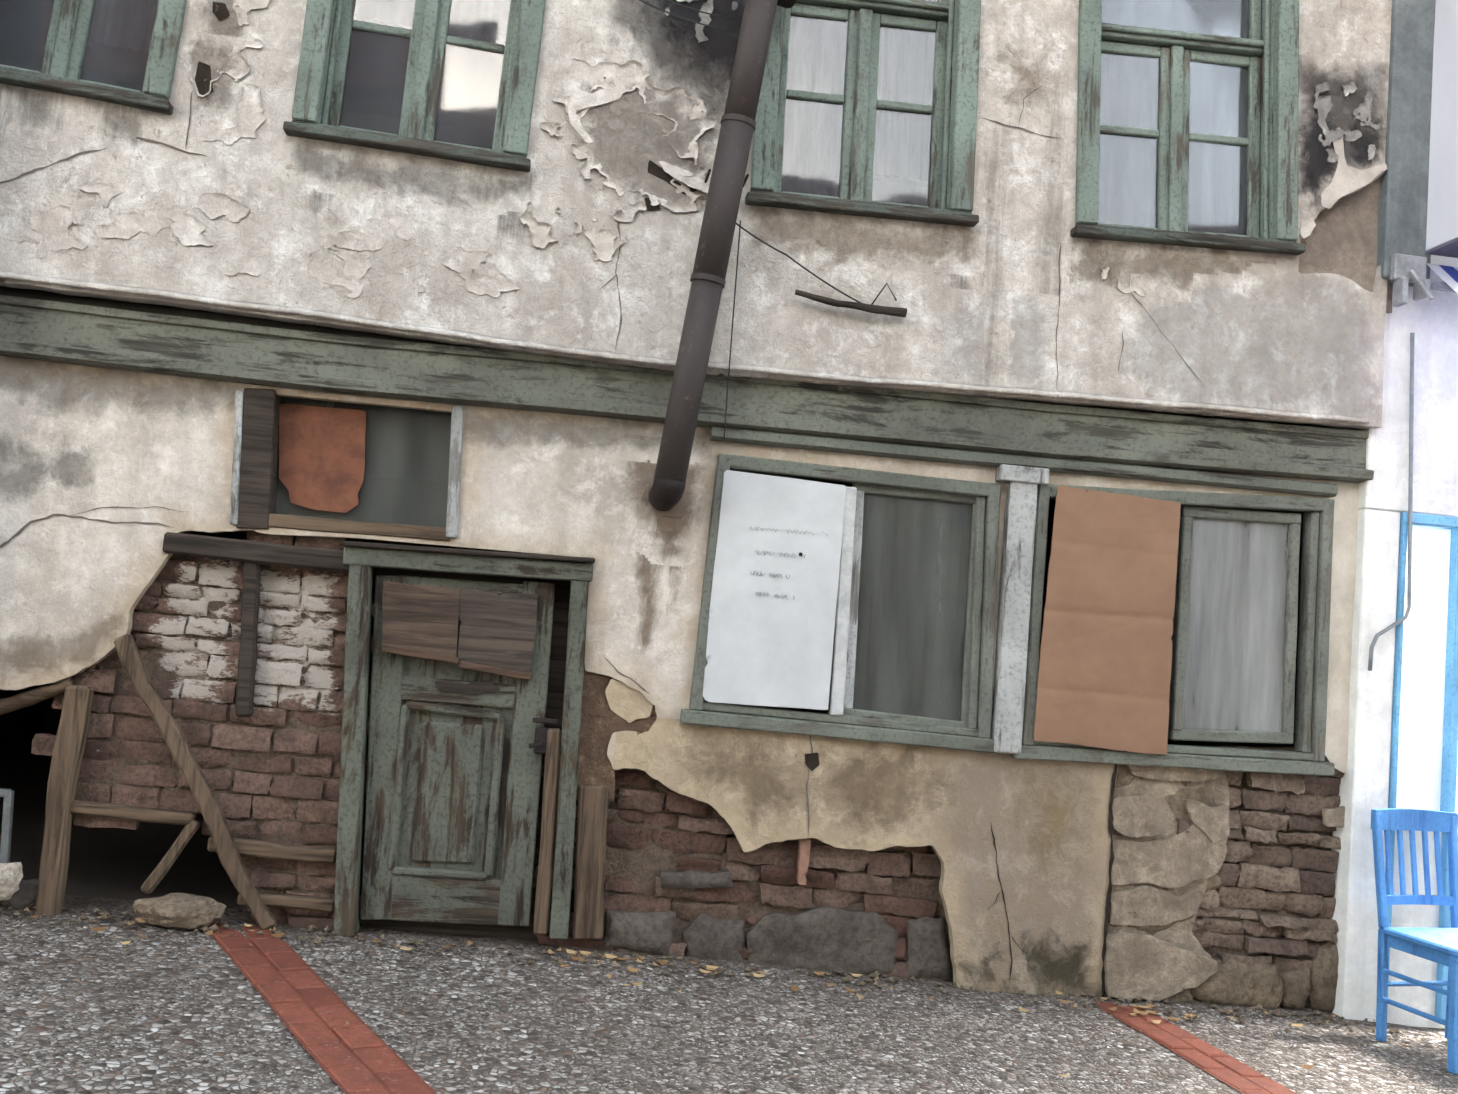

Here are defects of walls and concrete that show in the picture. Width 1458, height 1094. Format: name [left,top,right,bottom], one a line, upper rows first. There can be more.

crack [0,90,206,184]
flaking render [7,183,250,259]
flaking render [189,0,270,145]
flaking render [520,58,716,262]
flaking render [665,0,714,43]
flaking render [1298,80,1393,314]
crack [0,506,183,548]
flaking render [246,531,346,551]
flaking render [0,554,349,930]
flaking render [536,662,953,982]
crack [989,825,1027,993]
flaking render [1103,764,1345,1012]